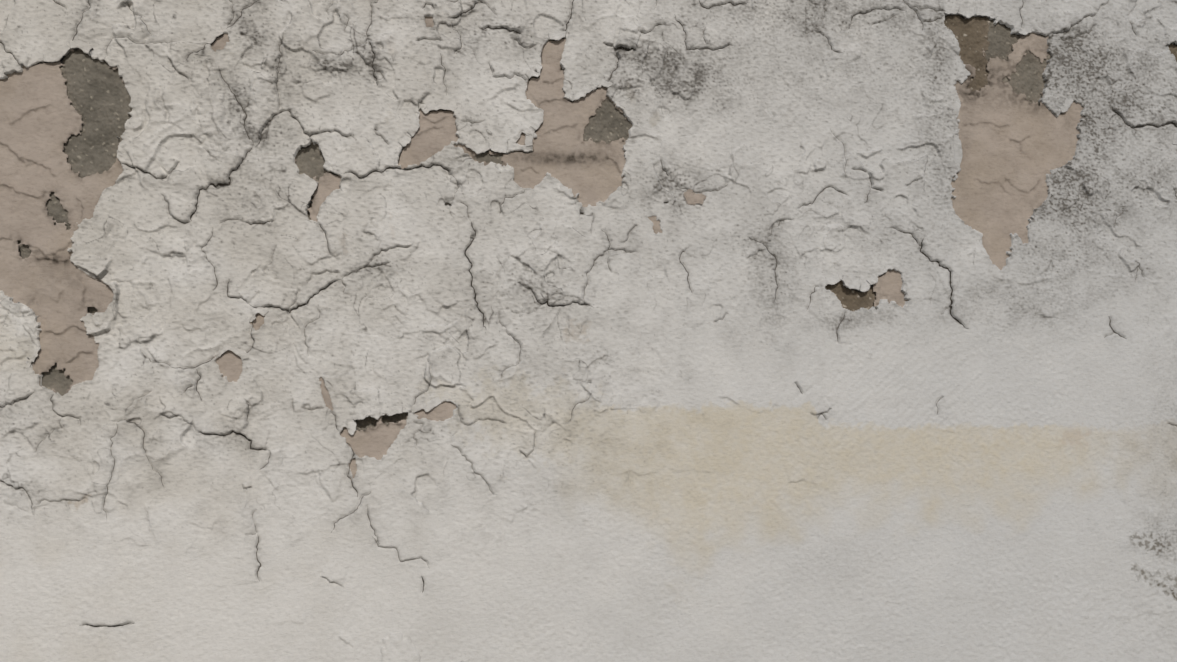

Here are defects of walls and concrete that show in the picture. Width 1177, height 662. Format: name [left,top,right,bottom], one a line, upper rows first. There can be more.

peeling [0,40,132,396]
peeling [295,142,342,222]
crack [106,0,536,377]
peeling [398,31,632,207]
crack [515,212,637,308]
crack [603,0,748,82]
peeling [820,269,908,311]
crack [890,227,968,329]
peeling [944,7,1084,270]
crack [2,355,270,581]
peeling [340,396,457,480]
damp [414,358,1177,643]